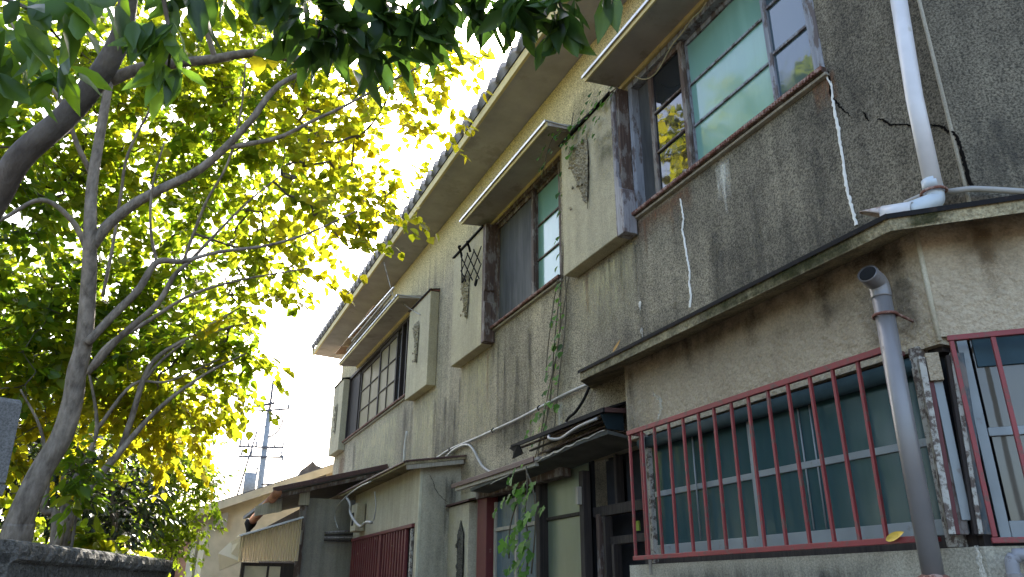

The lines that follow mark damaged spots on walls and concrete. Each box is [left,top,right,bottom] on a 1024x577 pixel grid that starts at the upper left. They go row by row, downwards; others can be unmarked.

spalling [567,135,589,209]
crack [826,71,974,226]